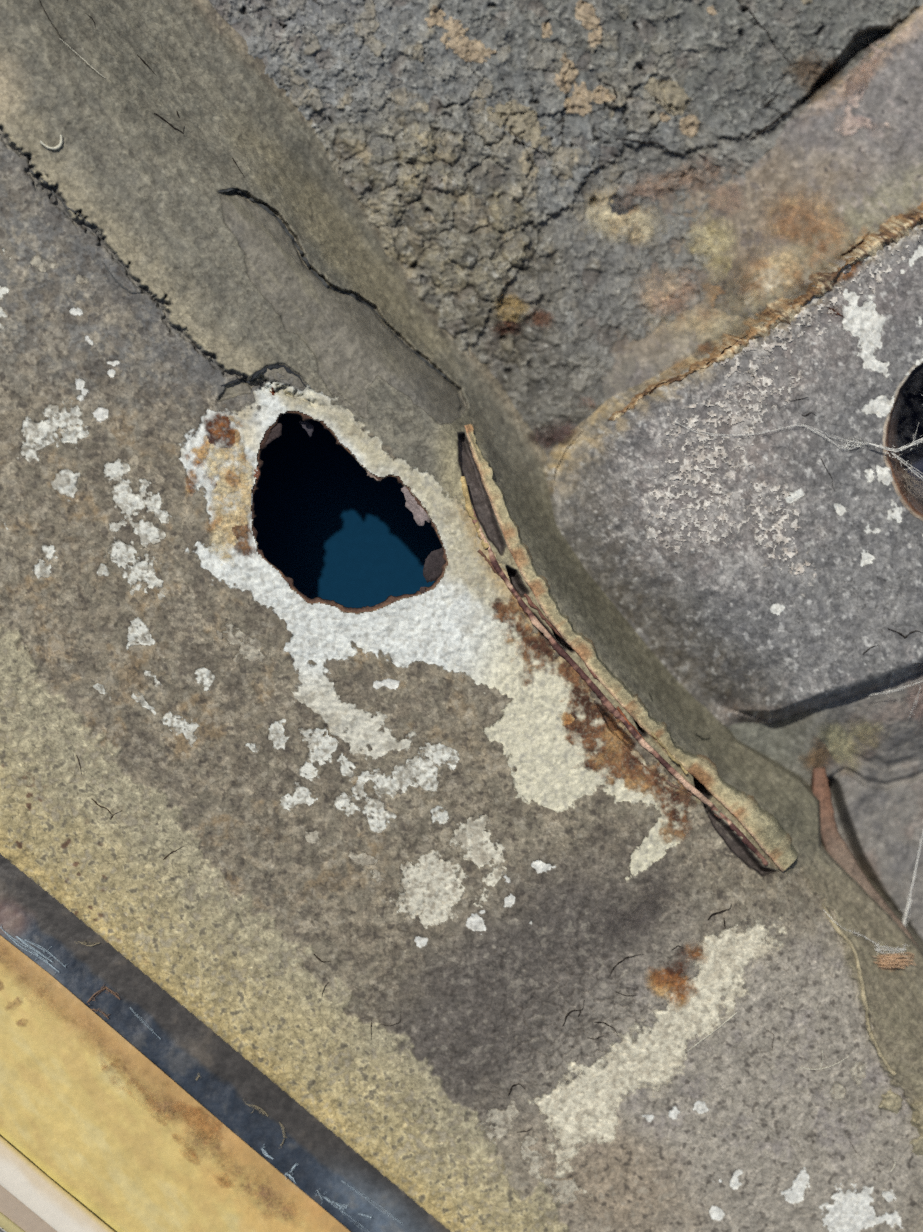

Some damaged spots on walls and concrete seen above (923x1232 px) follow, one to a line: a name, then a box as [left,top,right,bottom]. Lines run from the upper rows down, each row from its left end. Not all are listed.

crack [154,112,184,133]
crack [29,168,149,293]
crack [218,159,459,390]
crack [221,364,308,396]
rust [186,413,254,559]
spalling [253,414,446,609]
rust [492,596,696,842]
rust [649,947,703,1006]